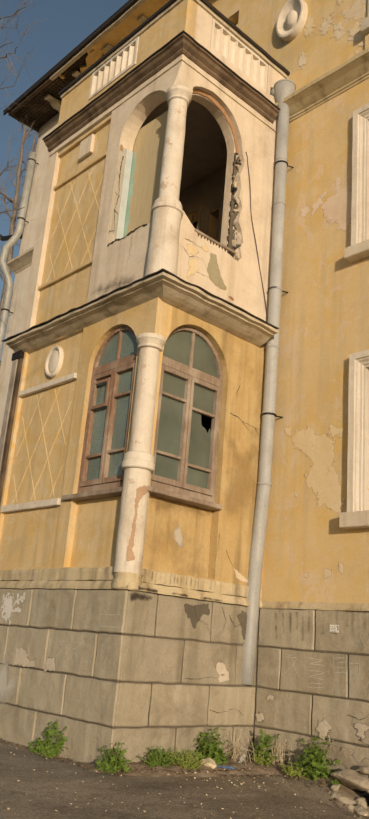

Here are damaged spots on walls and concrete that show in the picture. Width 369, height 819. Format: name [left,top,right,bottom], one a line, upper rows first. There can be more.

peeling [303,0,368,55]
spalling [193,89,242,261]
peeling [298,177,352,231]
flaking render [186,239,234,300]
peeling [284,424,345,519]
peeling [126,485,148,561]
peeling [0,592,25,624]
spalling [10,647,56,672]
spalling [215,661,229,683]
spalling [297,718,369,776]
flaking render [350,788,369,806]